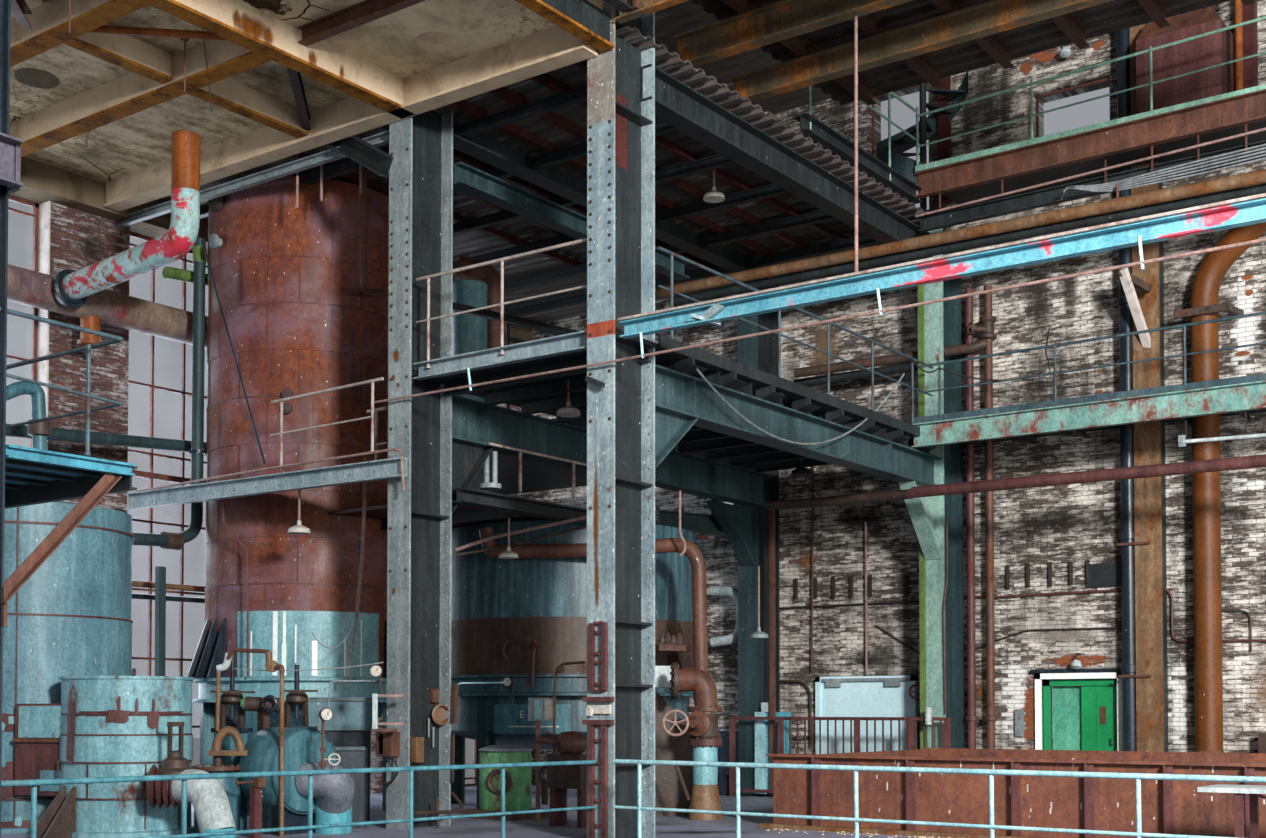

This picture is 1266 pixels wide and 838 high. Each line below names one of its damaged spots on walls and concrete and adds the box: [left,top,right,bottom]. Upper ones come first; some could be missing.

spalling [244,0,292,17]